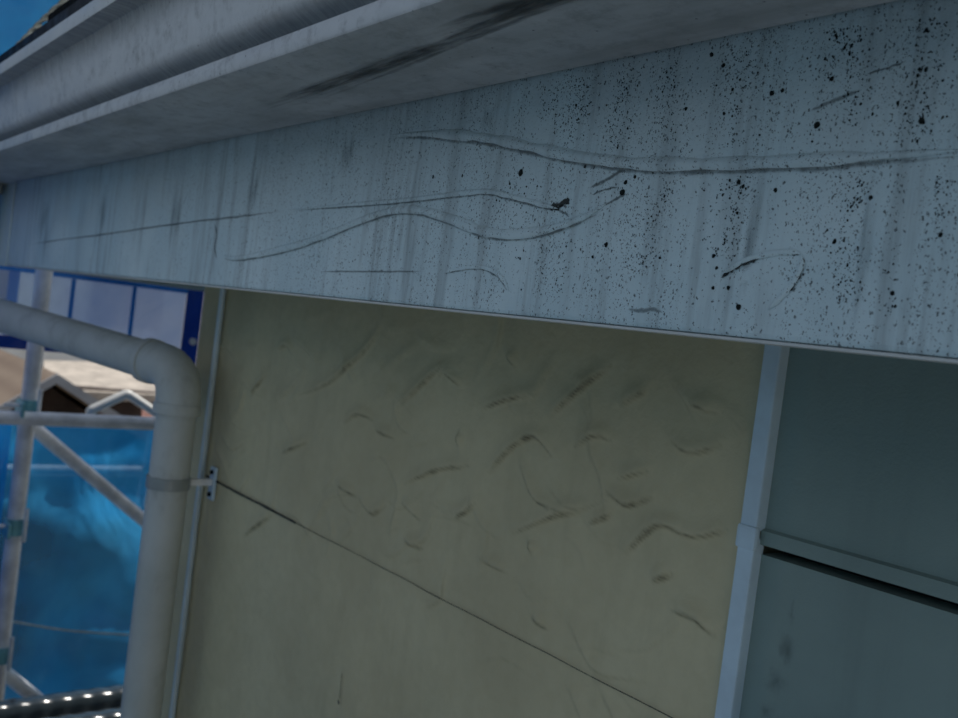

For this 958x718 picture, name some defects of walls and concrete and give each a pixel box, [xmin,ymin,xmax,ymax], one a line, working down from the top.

leakage [710,45,784,149]
leakage [807,26,876,126]
leakage [884,18,958,150]
crack [214,129,958,261]
leakage [625,172,680,272]
leakage [702,176,751,290]
leakage [802,171,875,303]
crack [206,475,673,718]